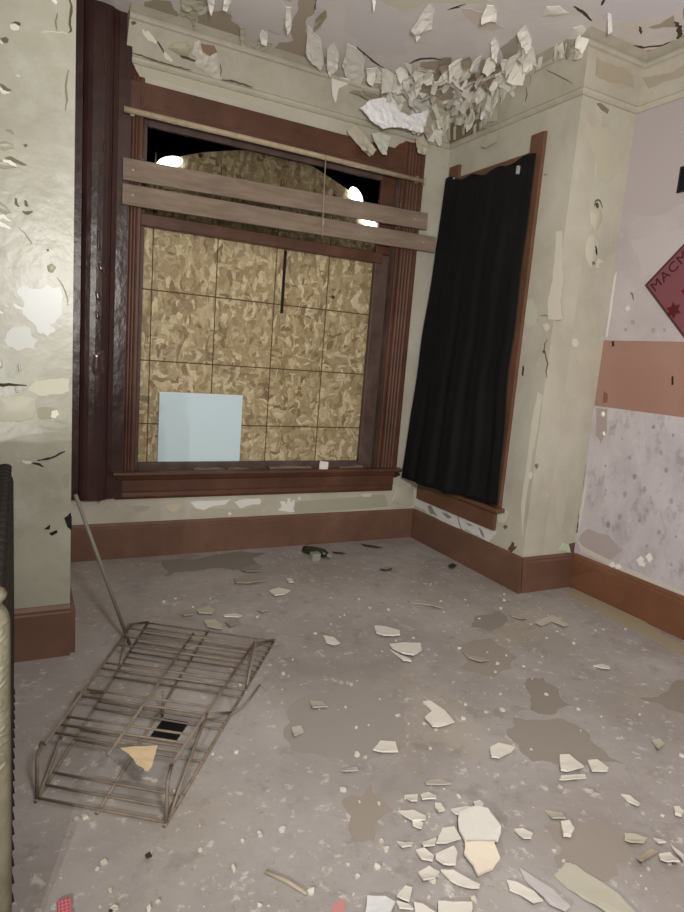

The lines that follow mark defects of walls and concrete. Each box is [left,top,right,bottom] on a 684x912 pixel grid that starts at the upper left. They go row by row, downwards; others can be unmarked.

peeling [144,0,240,36]
peeling [648,10,684,29]
spalling [192,40,221,80]
peeling [252,0,589,156]
peeling [596,57,684,89]
peeling [543,231,563,331]
crack [522,340,549,378]
crack [0,381,27,389]
peeling [28,378,70,396]
peeling [38,407,59,420]
flaking render [164,498,262,518]
peeling [279,497,301,512]